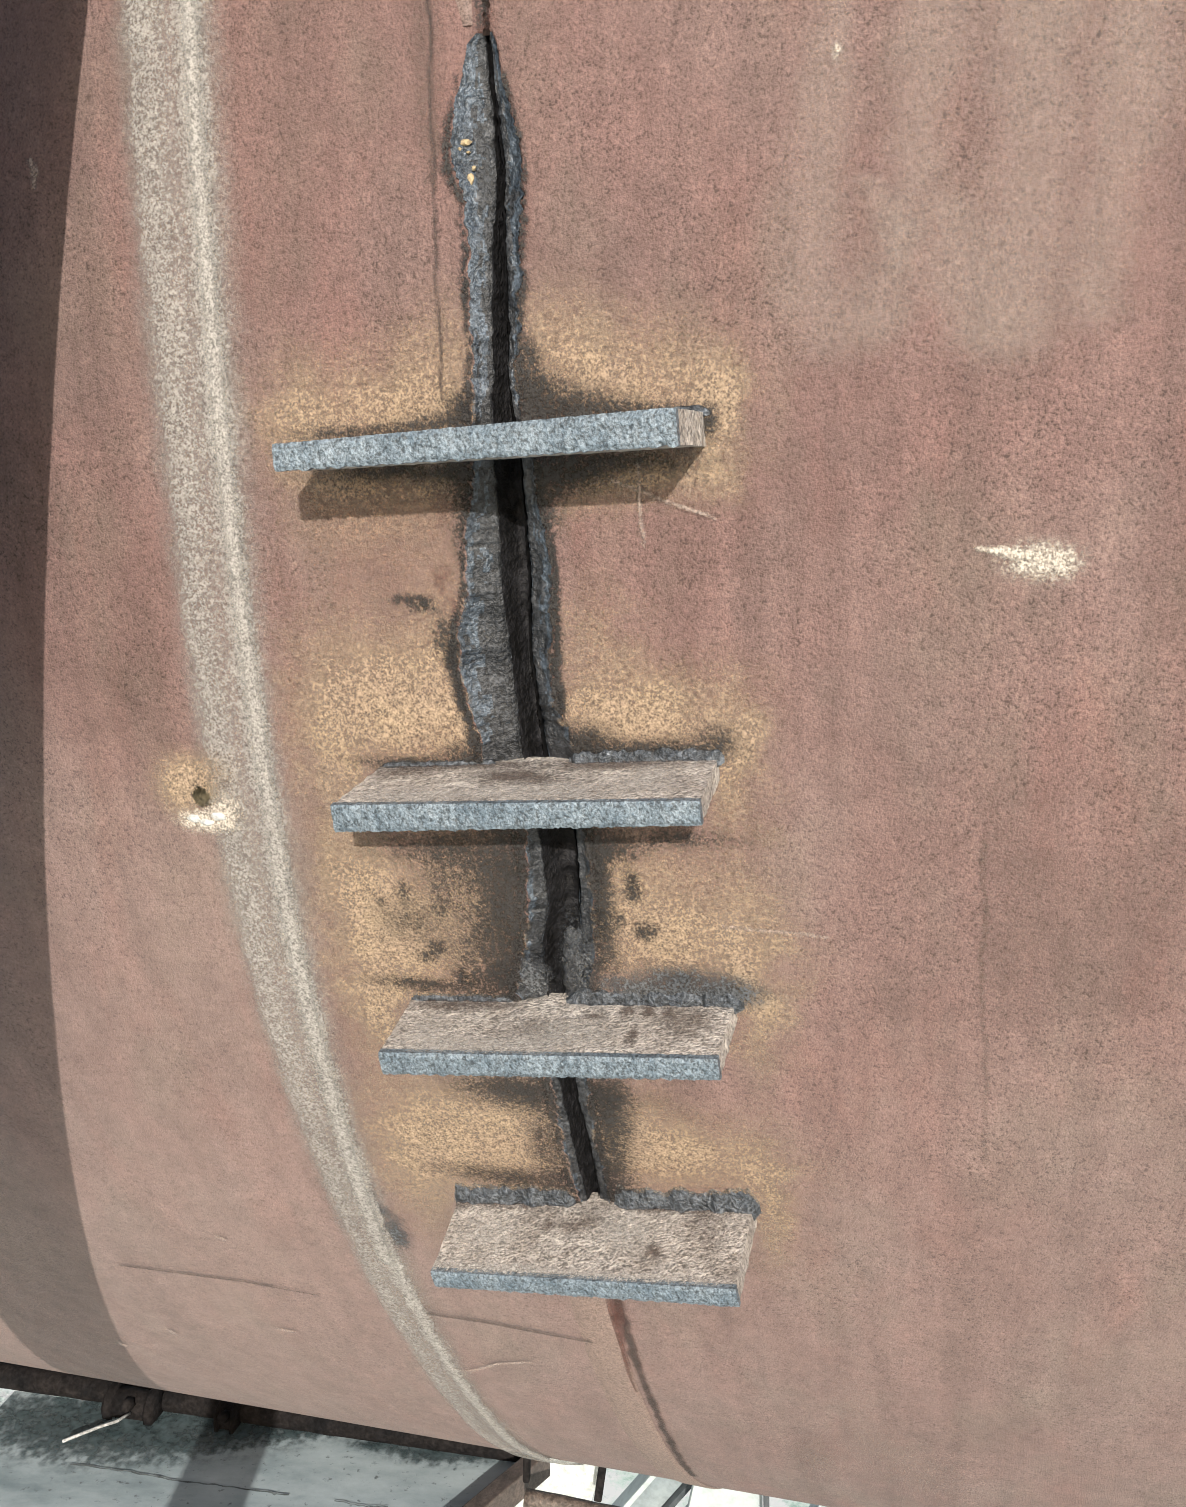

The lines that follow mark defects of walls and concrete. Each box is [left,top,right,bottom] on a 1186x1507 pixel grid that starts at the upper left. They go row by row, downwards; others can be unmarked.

crack [474,0,550,759]
spalling [162,757,240,833]
crack [539,827,580,996]
crack [558,1077,600,1200]